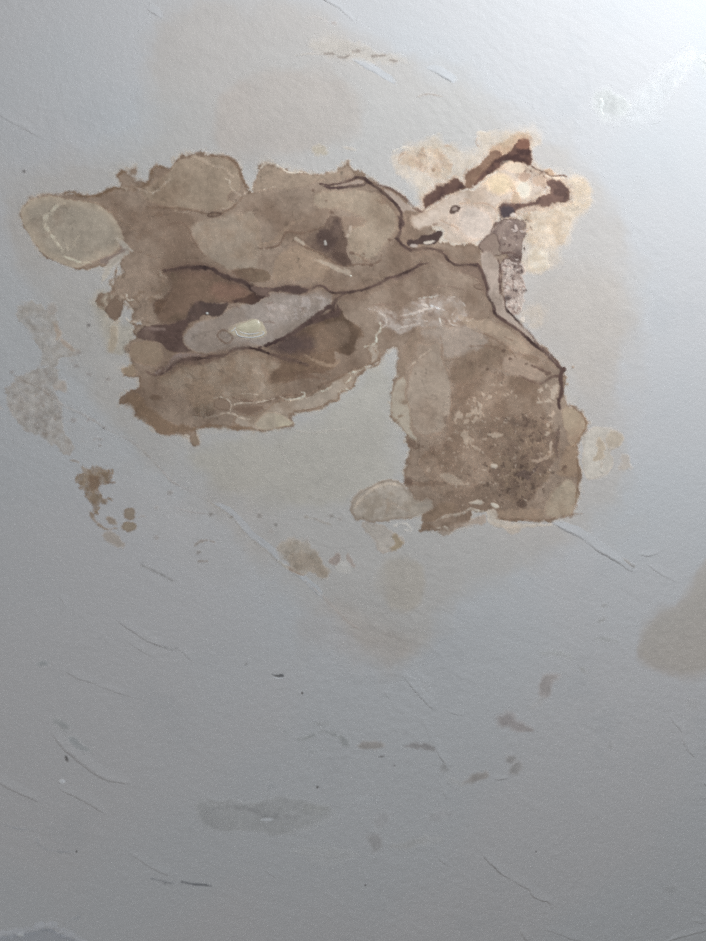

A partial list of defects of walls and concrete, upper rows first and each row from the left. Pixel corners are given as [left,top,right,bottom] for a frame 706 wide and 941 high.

damp [6,302,74,454]
damp [20,152,630,552]
crack [148,176,568,409]
flaking render [501,259,527,322]